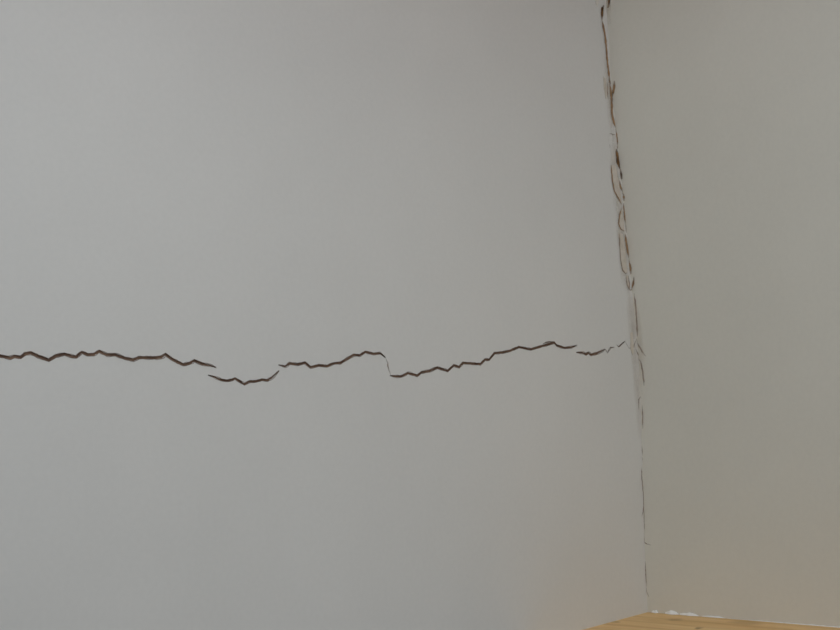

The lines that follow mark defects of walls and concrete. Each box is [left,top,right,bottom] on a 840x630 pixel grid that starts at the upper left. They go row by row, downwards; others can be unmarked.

crack [0,0,644,425]